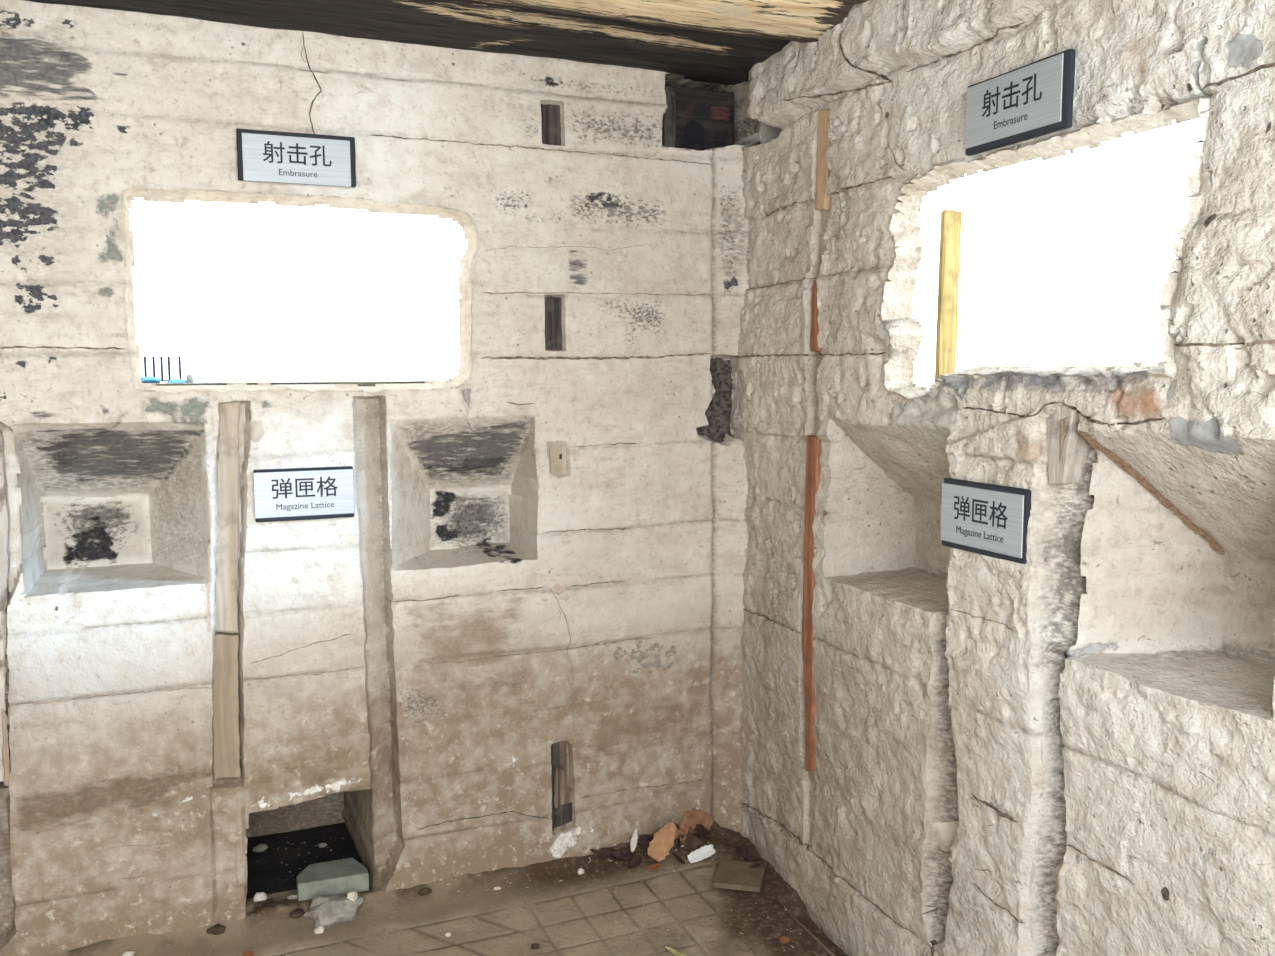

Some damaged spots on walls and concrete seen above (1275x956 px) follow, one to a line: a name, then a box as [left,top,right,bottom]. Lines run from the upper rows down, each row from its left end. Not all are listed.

crack [301,36,322,134]
mould [0,10,96,314]
mould [556,192,664,227]
crack [962,402,1164,425]